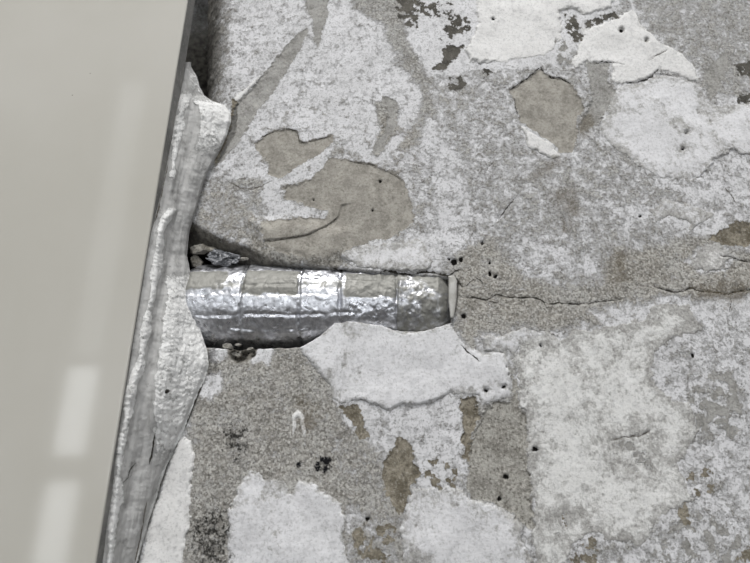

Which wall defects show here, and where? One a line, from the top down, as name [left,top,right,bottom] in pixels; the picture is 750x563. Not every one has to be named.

peeling [214,0,329,167]
flaking render [395,0,750,183]
peeling [254,129,433,273]
crack [380,269,620,310]
crack [656,287,750,312]
flaking render [690,220,750,274]
flaking render [225,301,750,563]